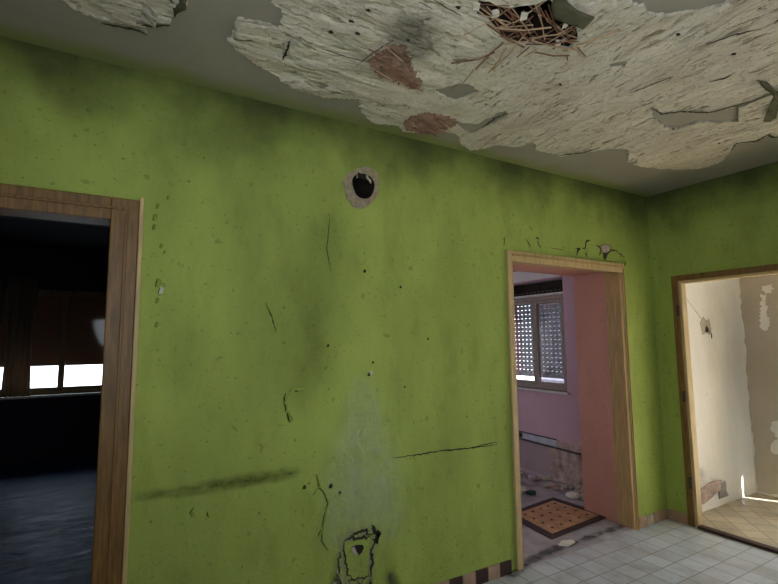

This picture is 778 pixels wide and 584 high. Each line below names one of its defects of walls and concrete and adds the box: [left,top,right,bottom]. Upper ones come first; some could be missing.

flaking render [63,0,188,35]
flaking render [227,0,778,170]
spalling [342,166,379,209]
flaking render [739,274,778,494]
crack [394,442,498,458]
crack [313,475,381,584]